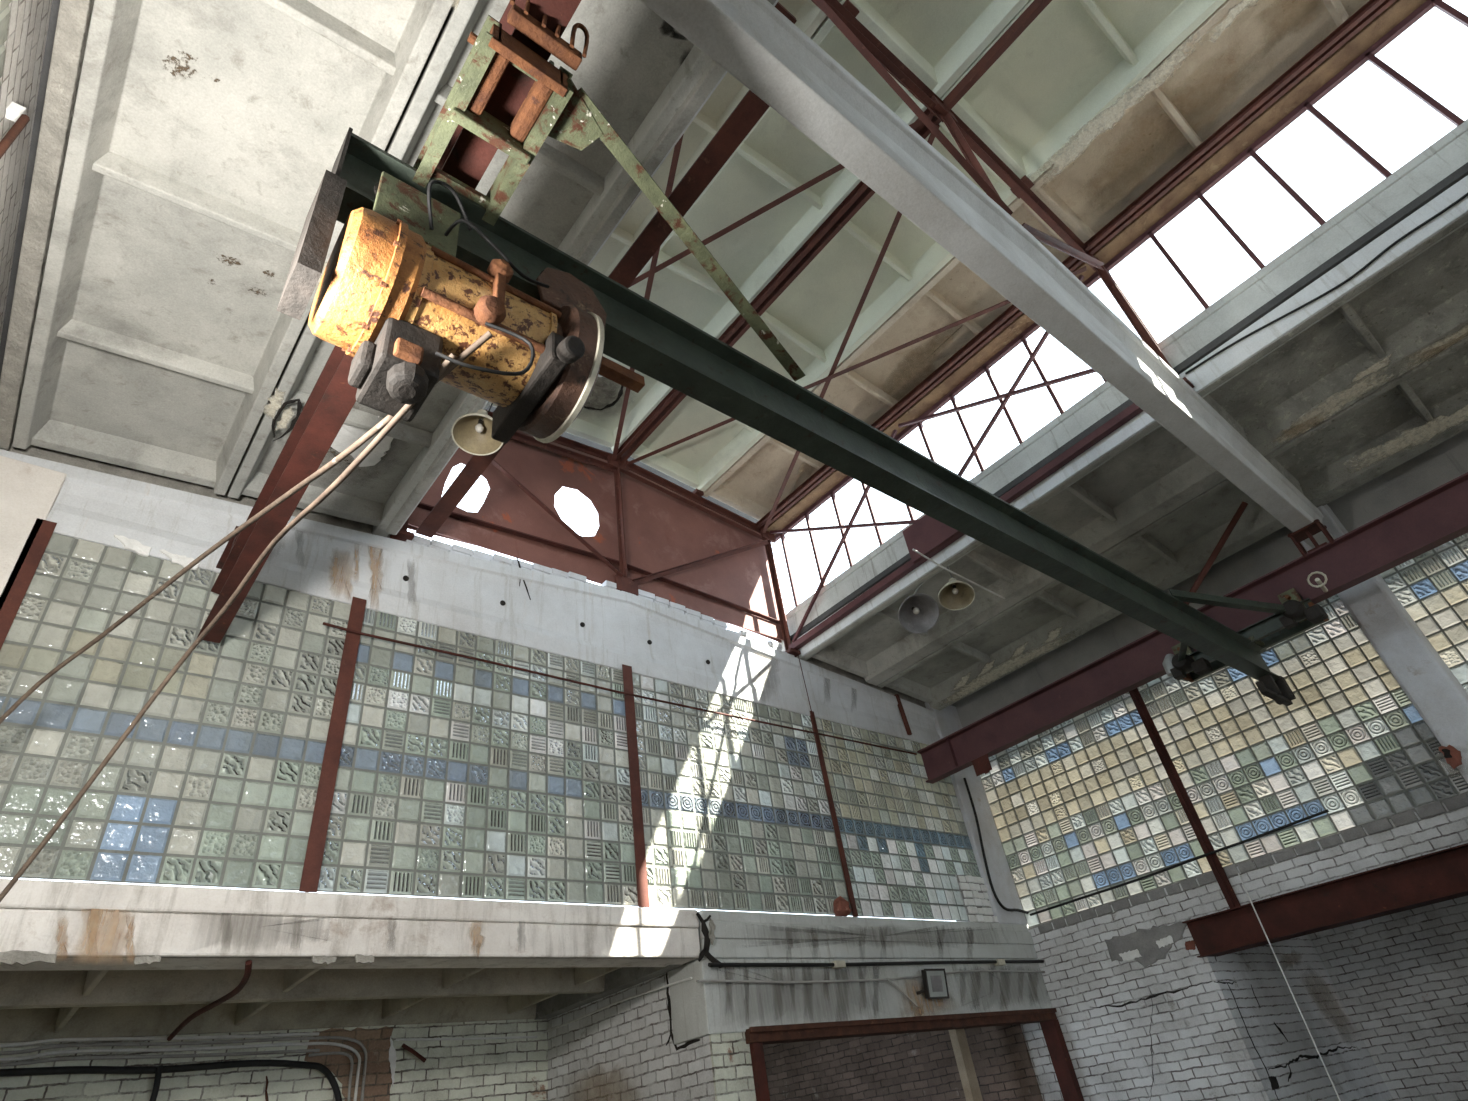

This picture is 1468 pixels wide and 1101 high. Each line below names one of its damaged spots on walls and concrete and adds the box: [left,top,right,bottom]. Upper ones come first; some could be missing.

peeling [327,407,393,467]
rust [57,909,133,954]
peeling [1105,918,1196,968]
crack [1092,957,1356,1100]
peeling [304,1026,397,1101]